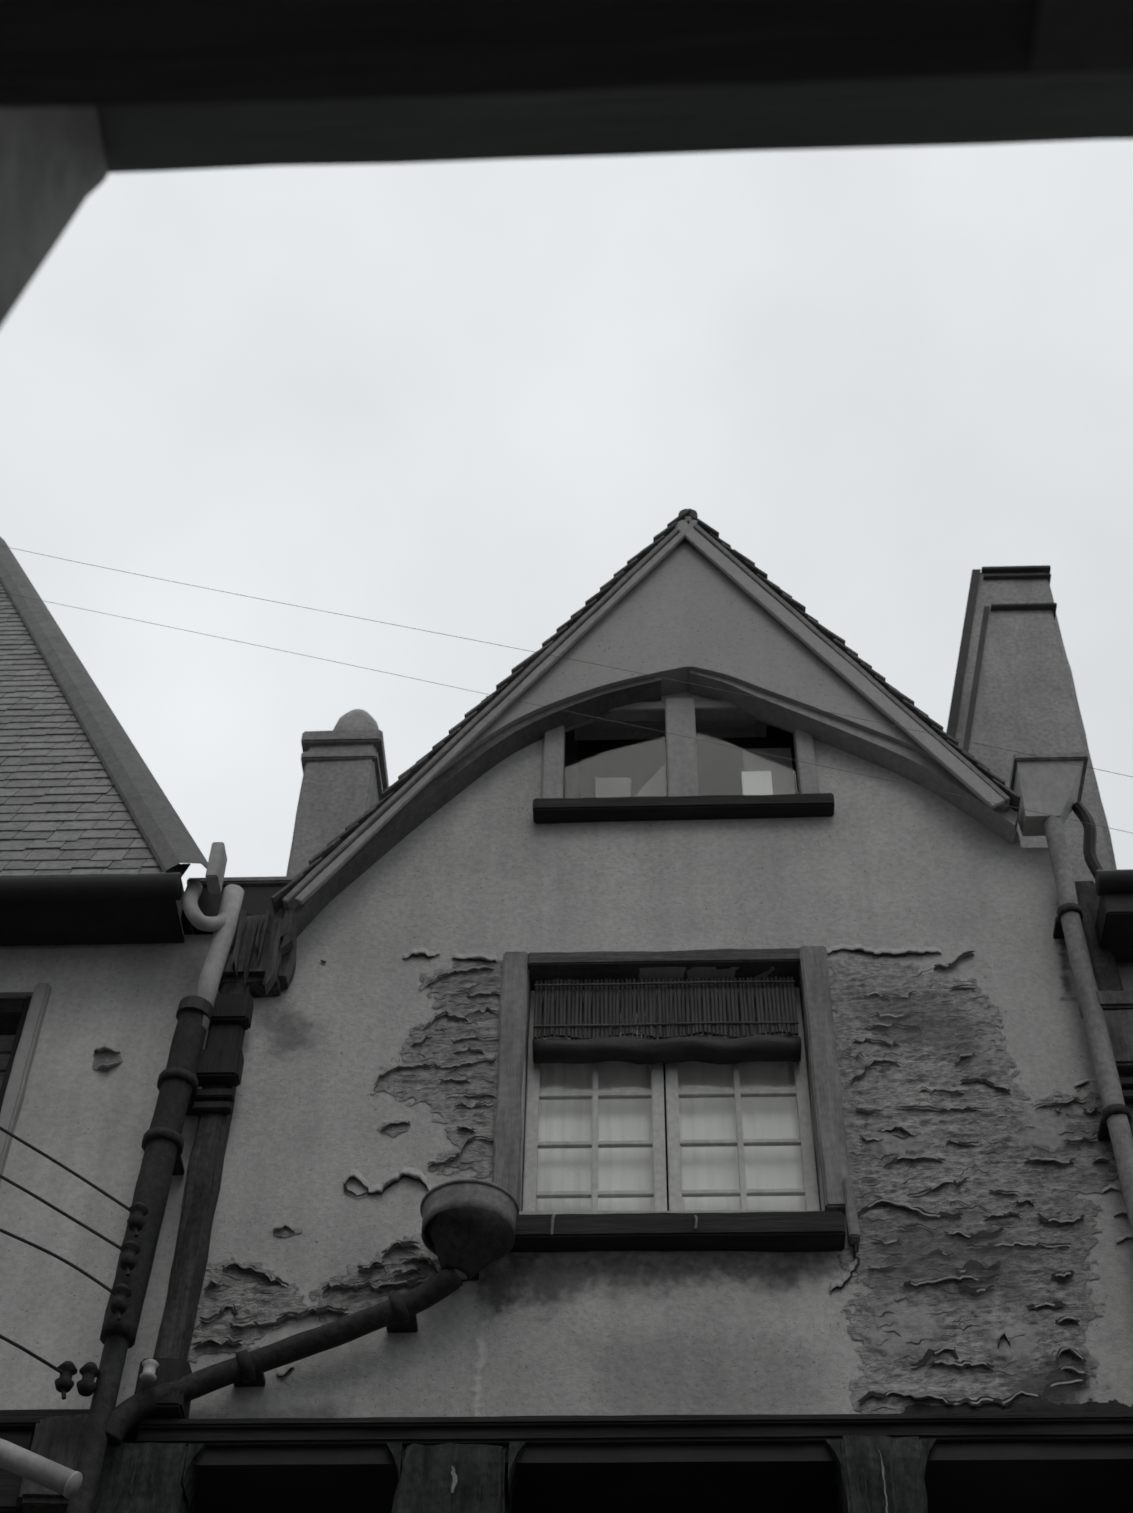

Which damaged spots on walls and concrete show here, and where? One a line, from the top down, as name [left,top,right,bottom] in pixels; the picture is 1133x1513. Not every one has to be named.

spalling [92,1046,123,1072]
spalling [369,960,503,1178]
spalling [828,951,1133,1414]
spalling [188,1233,441,1362]